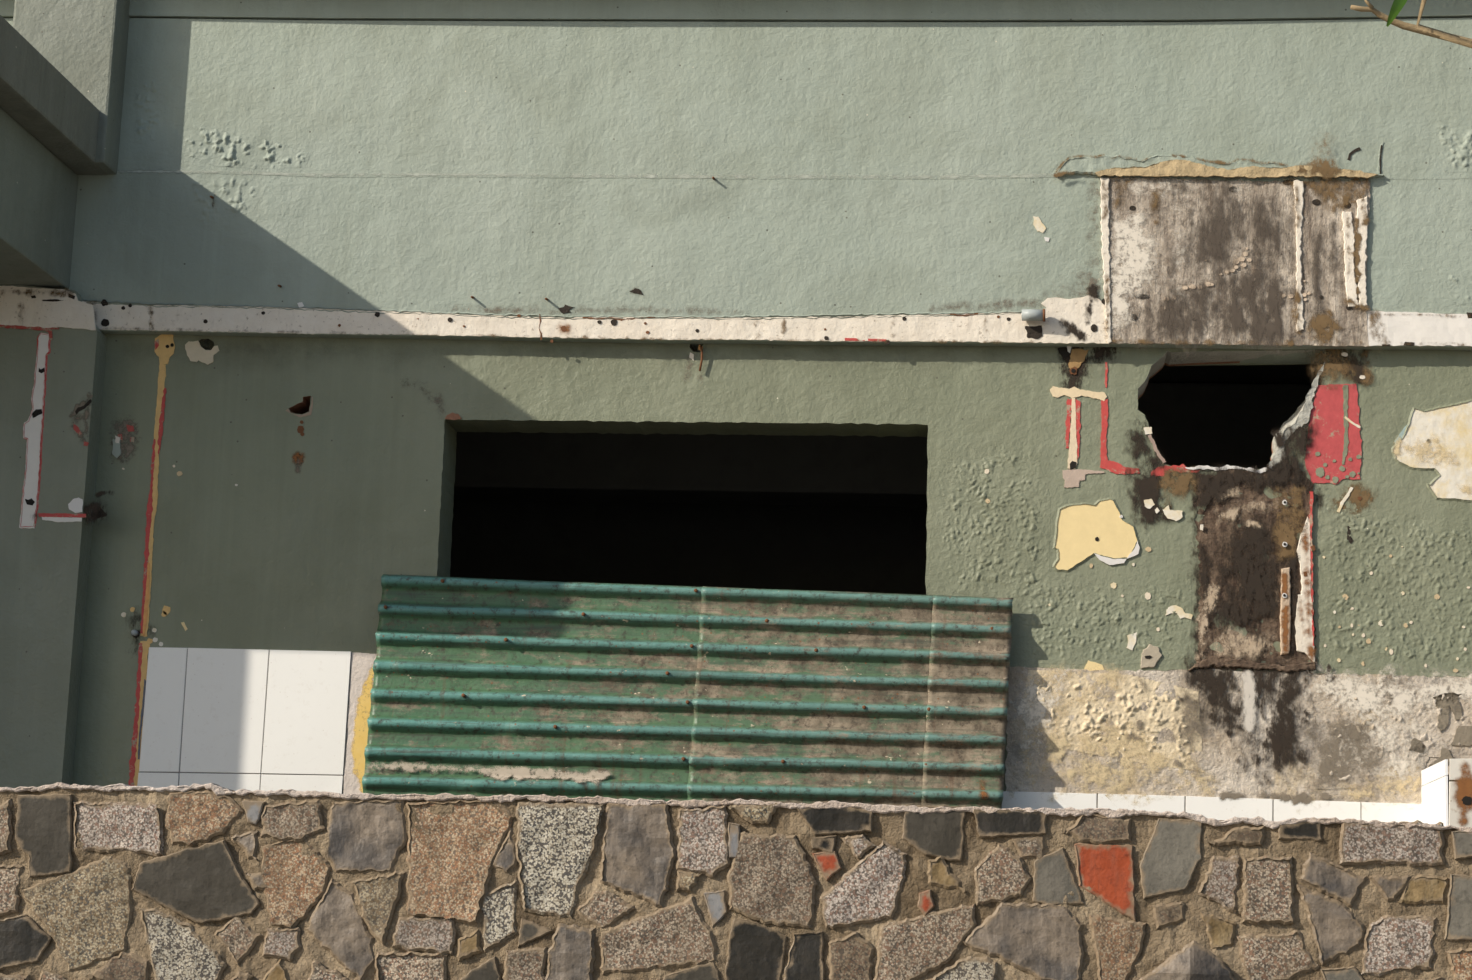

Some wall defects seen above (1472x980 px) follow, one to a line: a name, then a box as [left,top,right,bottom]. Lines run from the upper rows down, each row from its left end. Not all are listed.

peeling [1033,216,1050,242]
flaking render [1054,140,1385,192]
peeling [1050,305,1472,597]
flaking render [0,286,1108,786]
flaking render [1023,605,1204,772]
damp [1015,667,1472,805]
damp [1273,486,1315,659]
spalling [1333,594,1393,655]
spalling [1315,648,1472,789]
rust [1454,763,1472,826]